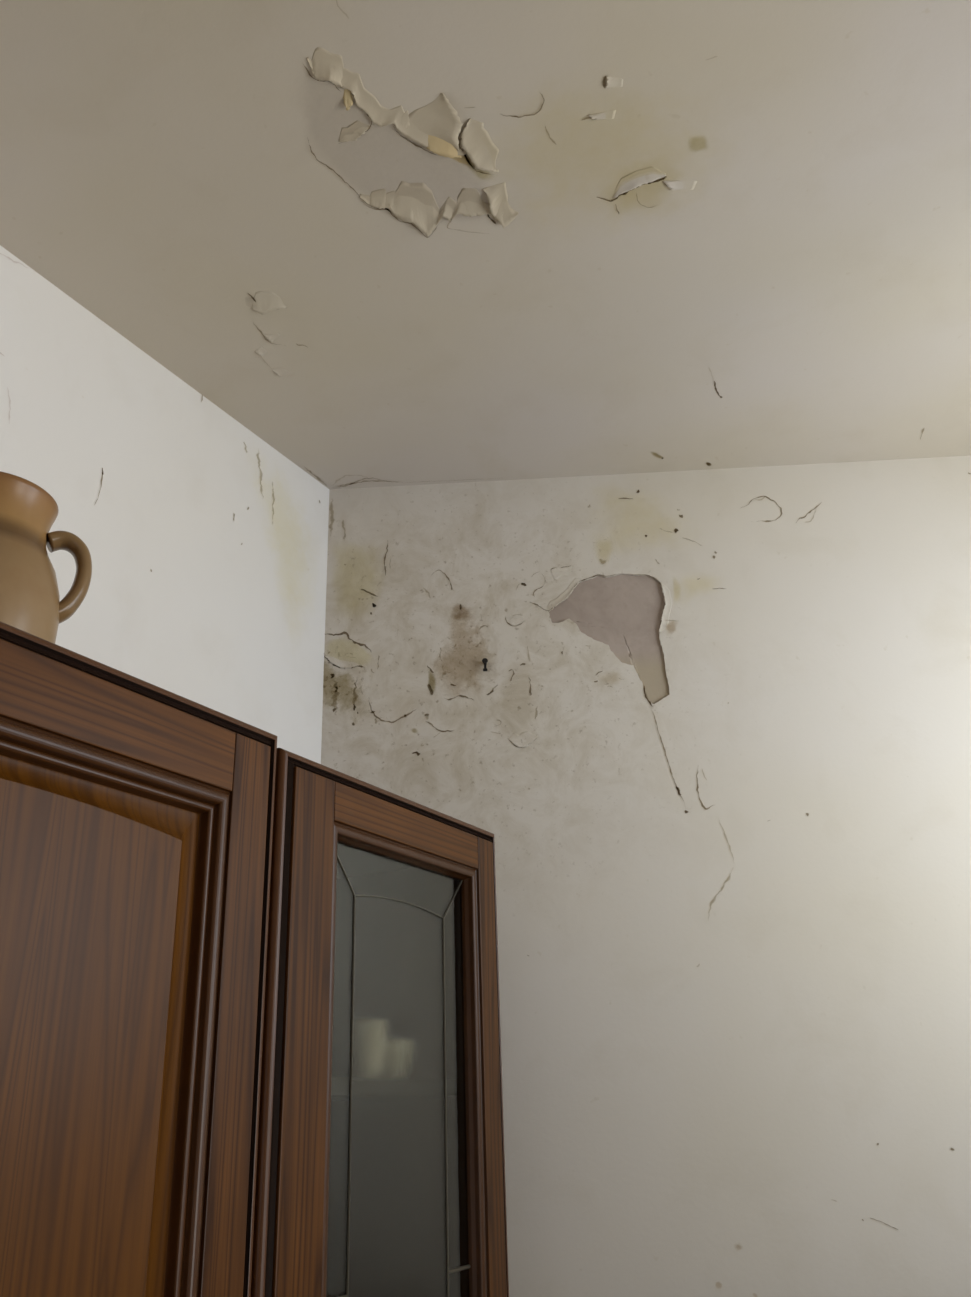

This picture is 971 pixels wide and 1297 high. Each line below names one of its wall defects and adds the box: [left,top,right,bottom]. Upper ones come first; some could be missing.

peeling [305,47,519,238]
spalling [521,566,672,706]
crack [654,716,711,813]